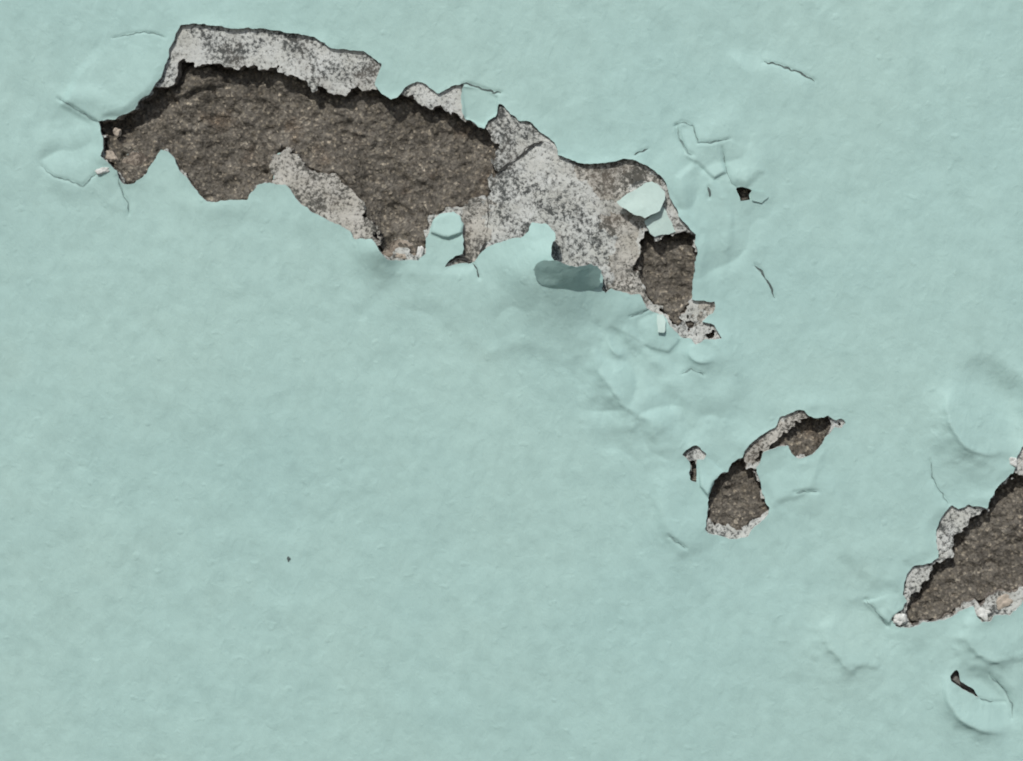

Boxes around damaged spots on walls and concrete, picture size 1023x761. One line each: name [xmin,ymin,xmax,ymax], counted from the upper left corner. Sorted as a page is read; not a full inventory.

crack [764,61,814,81]
spalling [61,24,815,353]
spalling [683,410,1023,627]